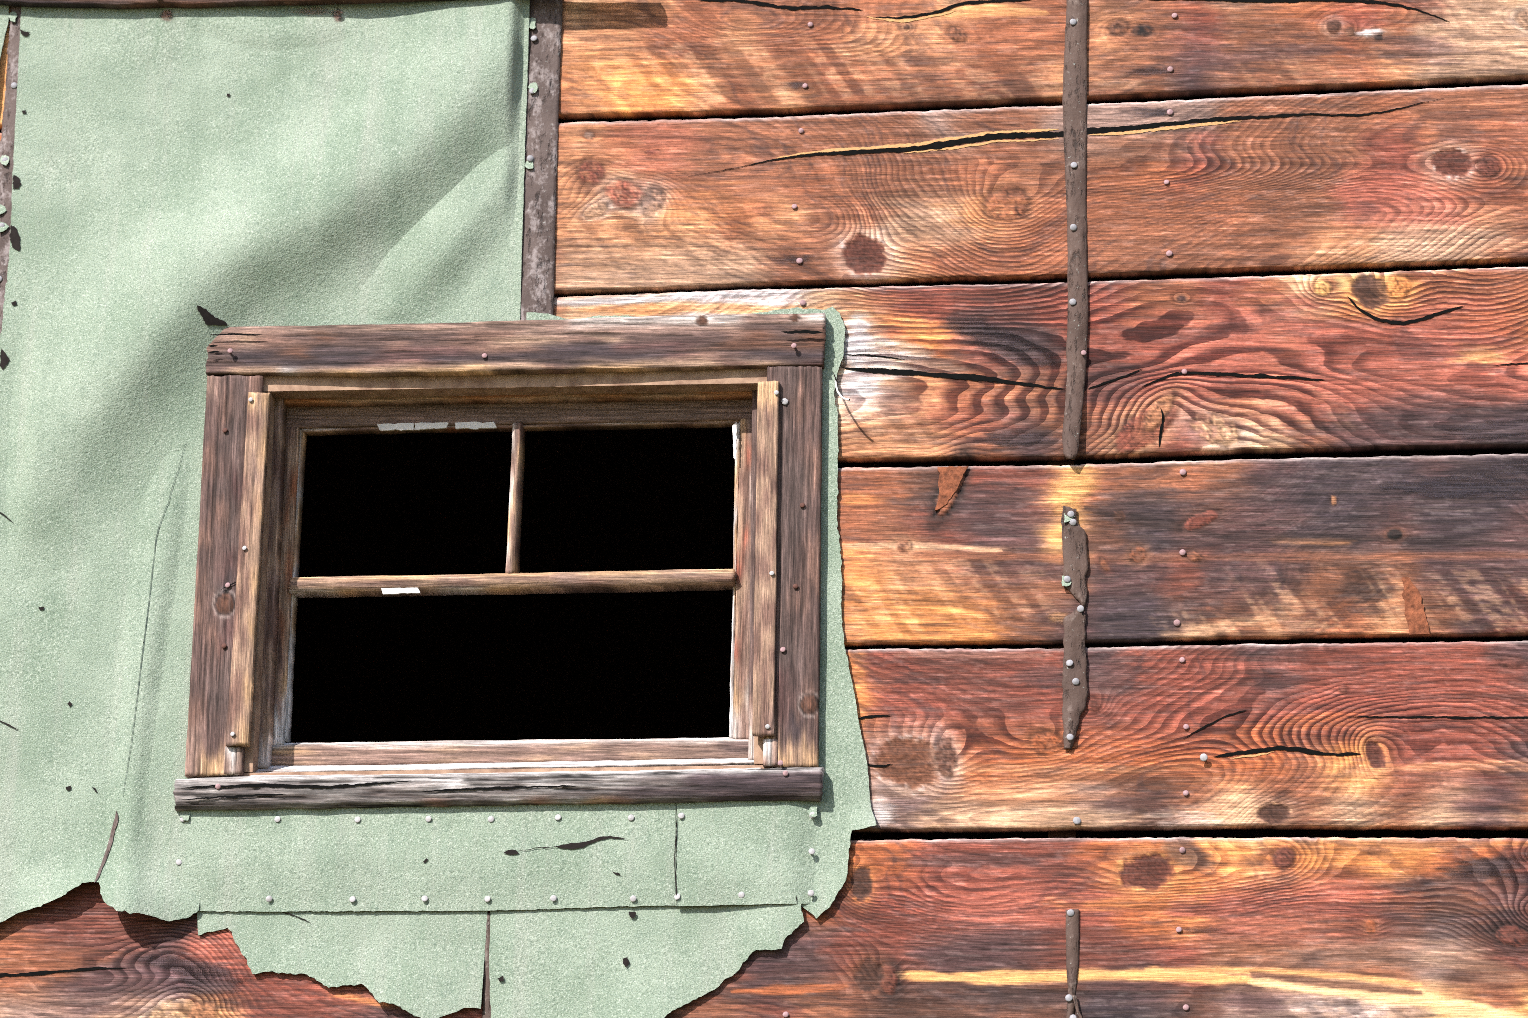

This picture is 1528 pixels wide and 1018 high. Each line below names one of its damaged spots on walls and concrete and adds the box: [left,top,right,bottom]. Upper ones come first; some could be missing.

crack [698,0,1027,23]
crack [1206,0,1449,22]
crack [688,98,1444,177]
crack [1347,296,1463,325]
crack [1185,710,1528,759]